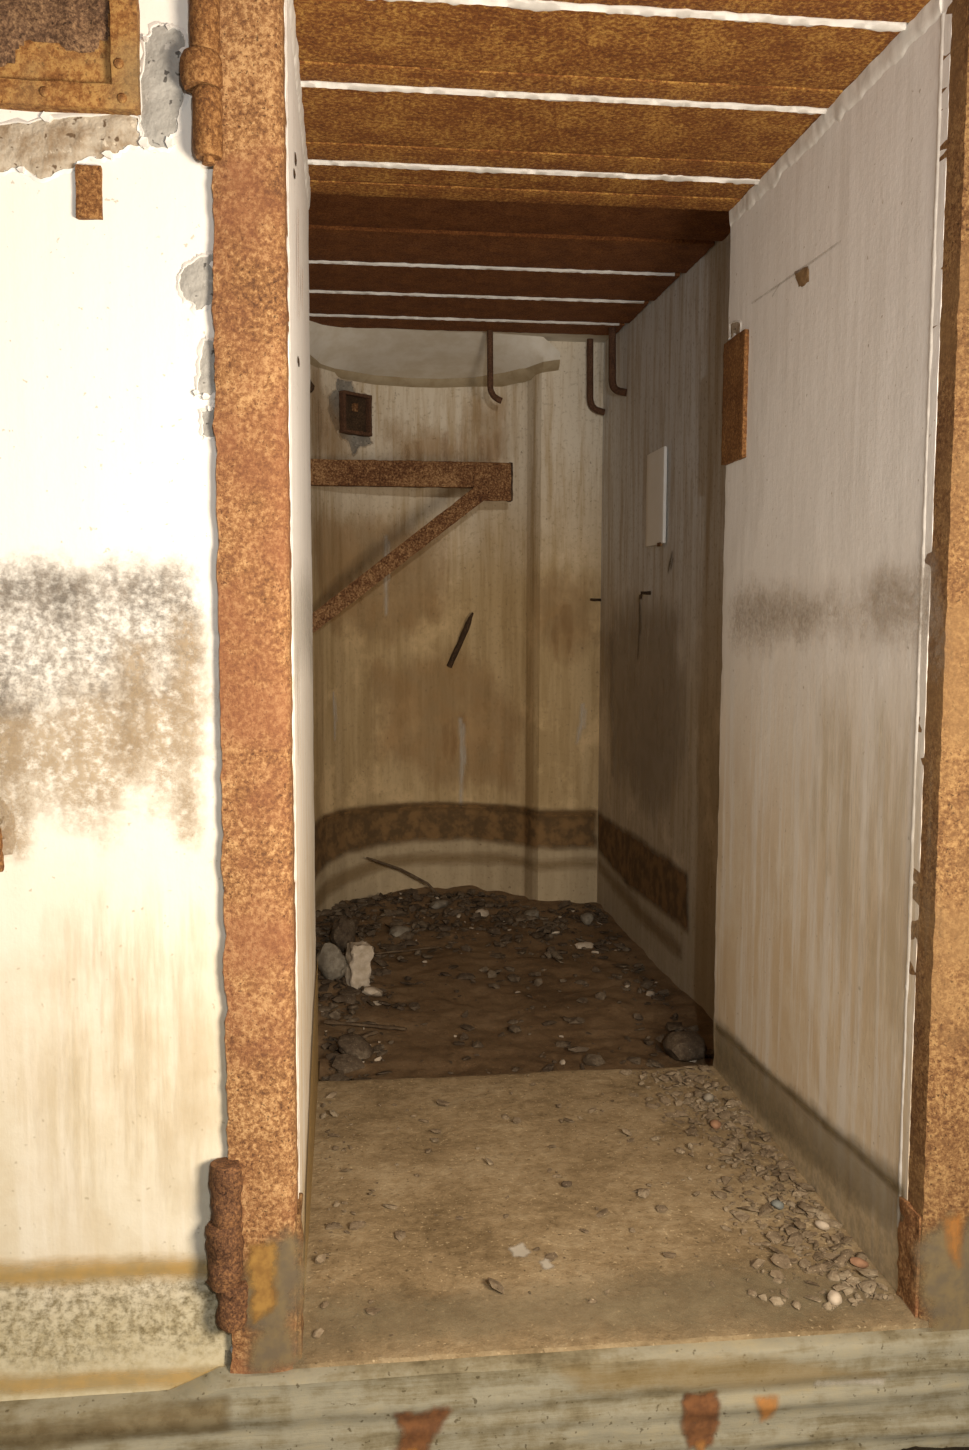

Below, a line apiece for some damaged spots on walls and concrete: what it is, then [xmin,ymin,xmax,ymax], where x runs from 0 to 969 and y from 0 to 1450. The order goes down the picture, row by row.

corrosion [0,0,110,67]
spalling [0,21,189,184]
water stain [0,571,198,851]
water stain [315,803,688,953]
corrosion [896,1196,921,1318]
corrosion [395,1408,451,1450]
corrosion [682,1391,719,1450]
corrosion [757,1398,777,1418]